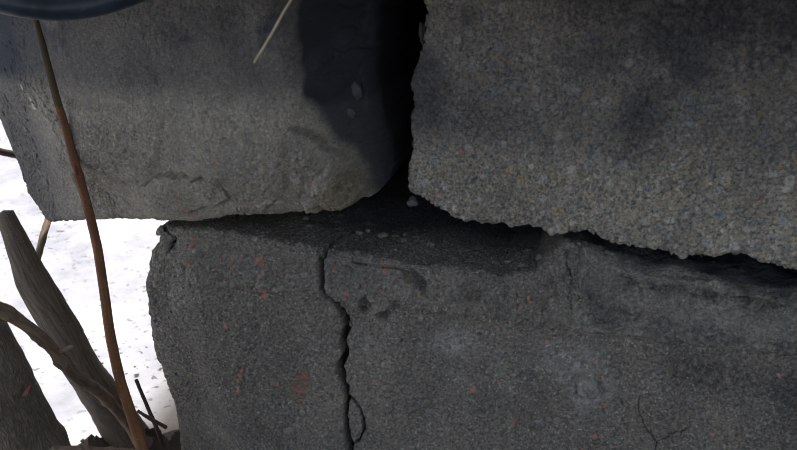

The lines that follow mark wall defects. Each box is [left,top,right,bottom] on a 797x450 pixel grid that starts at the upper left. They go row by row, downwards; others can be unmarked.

spalling [152,235,587,332]
crack [341,308,351,371]